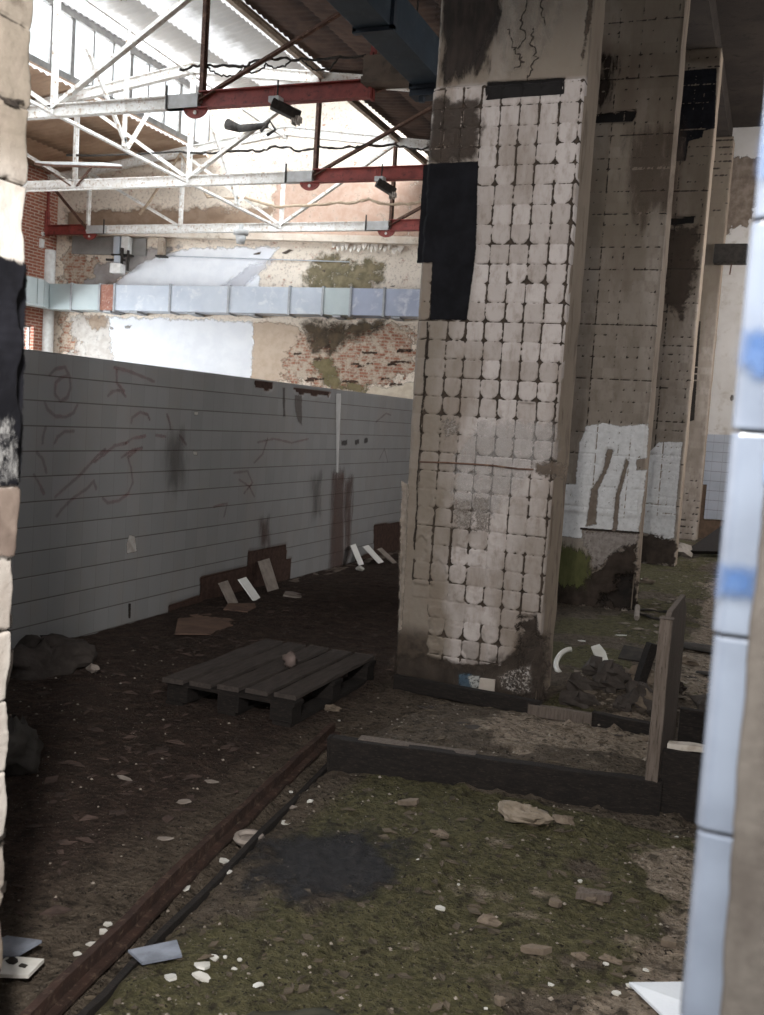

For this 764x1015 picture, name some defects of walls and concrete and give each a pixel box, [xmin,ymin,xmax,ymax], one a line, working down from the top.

crack [507,0,545,81]
damp [427,0,502,163]
damp [302,253,386,288]
flaking render [250,321,418,396]
peeling [0,421,18,481]
damp [557,533,678,611]